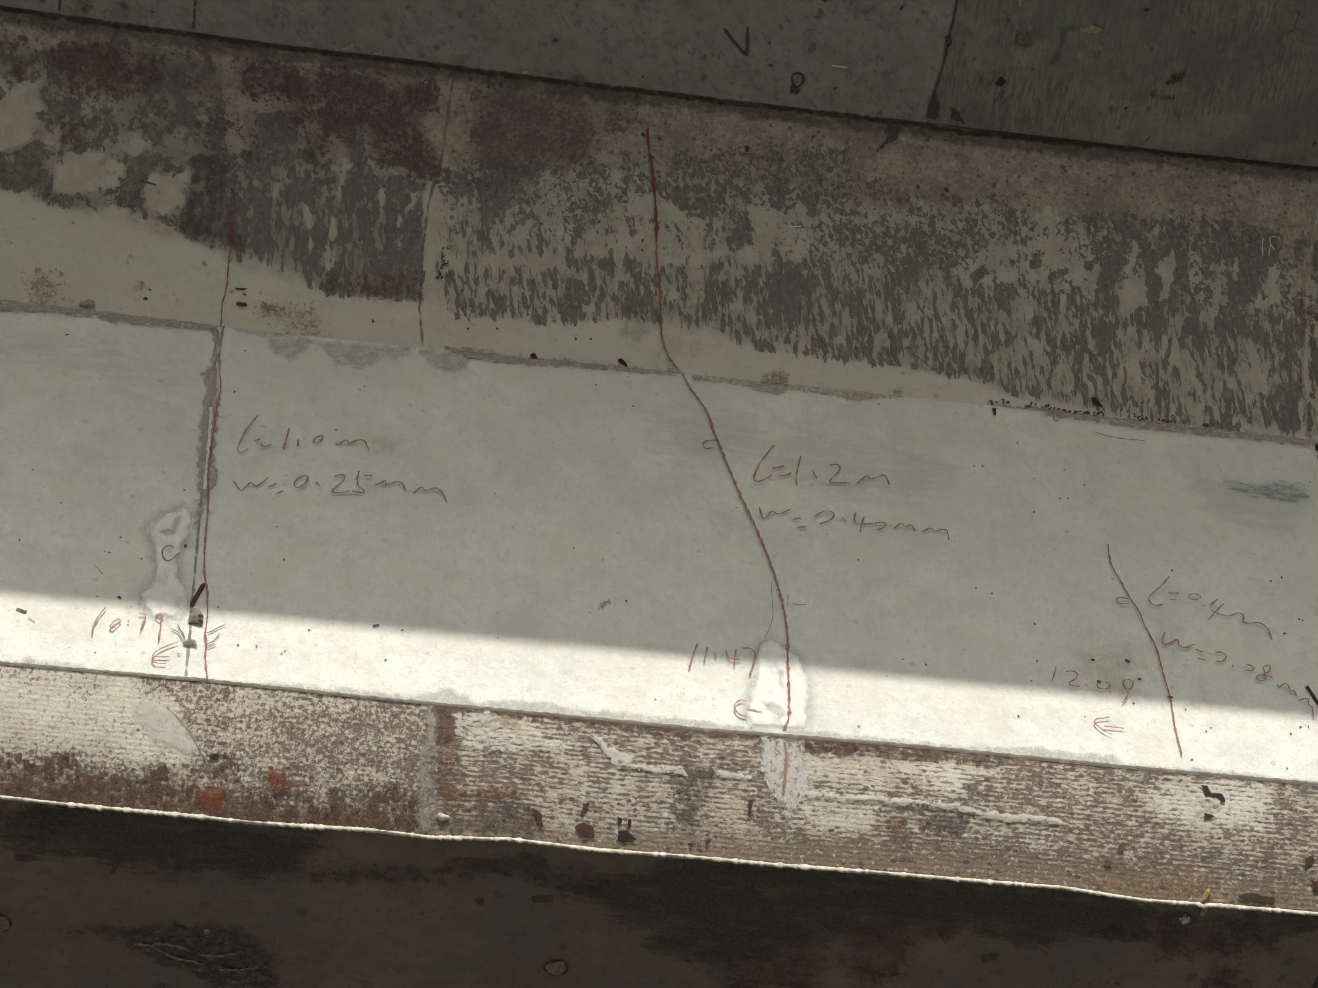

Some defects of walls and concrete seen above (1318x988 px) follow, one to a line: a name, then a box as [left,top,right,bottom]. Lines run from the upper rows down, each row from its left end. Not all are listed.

damp [0,299,221,616]
crack [203,199,236,679]
damp [0,19,1318,447]
crack [646,128,806,790]
damp [182,641,1318,839]
crack [1107,544,1182,754]